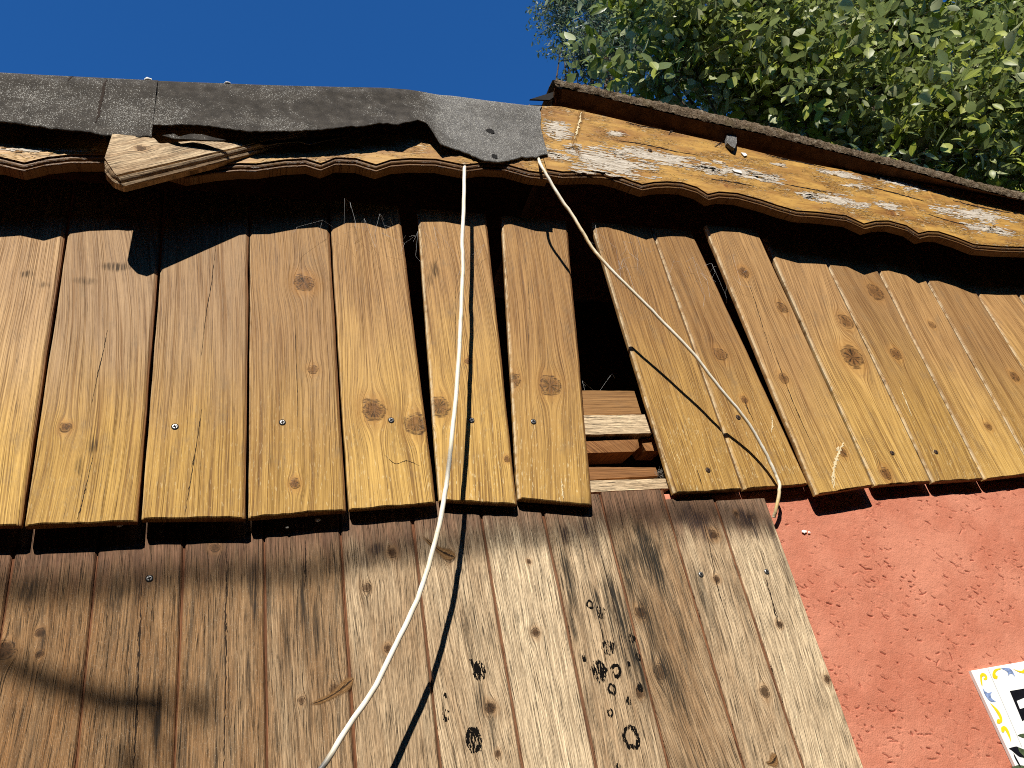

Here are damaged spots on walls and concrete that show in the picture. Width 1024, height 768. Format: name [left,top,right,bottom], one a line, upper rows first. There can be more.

peeling [795,168,1019,237]
crack [185,410,202,511]
damp [620,525,665,595]
damp [591,566,686,708]